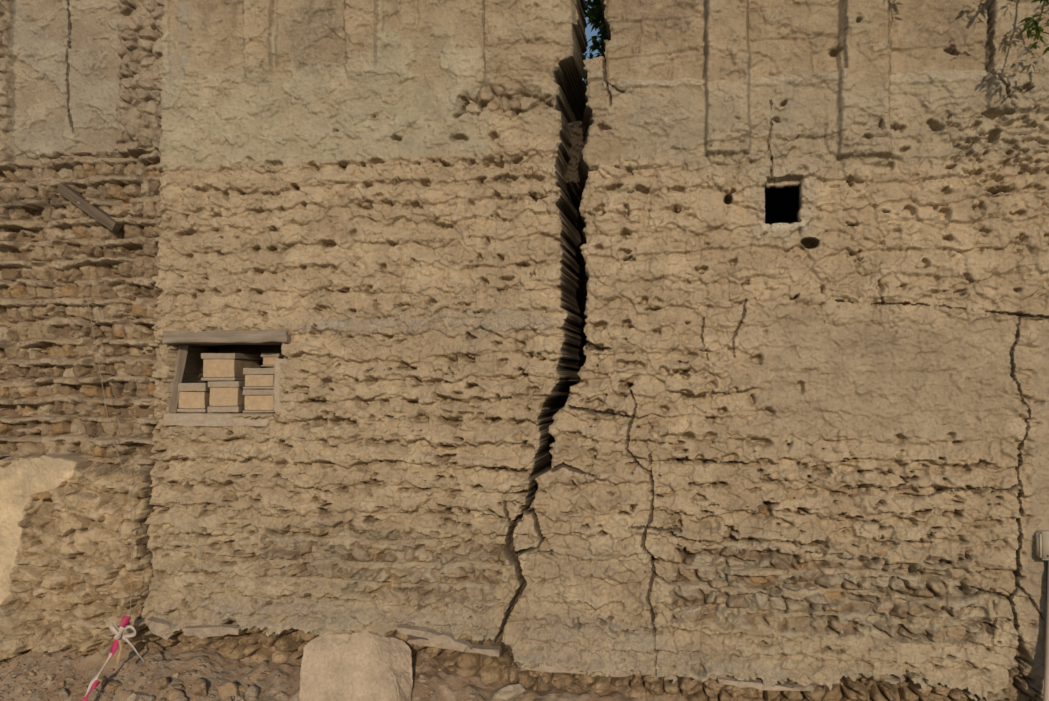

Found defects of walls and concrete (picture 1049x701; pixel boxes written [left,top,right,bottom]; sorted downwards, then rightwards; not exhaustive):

crack [65,0,79,133]
spalling [0,145,318,664]
crack [493,0,683,677]
spalling [397,624,1043,701]
crack [835,286,1049,696]